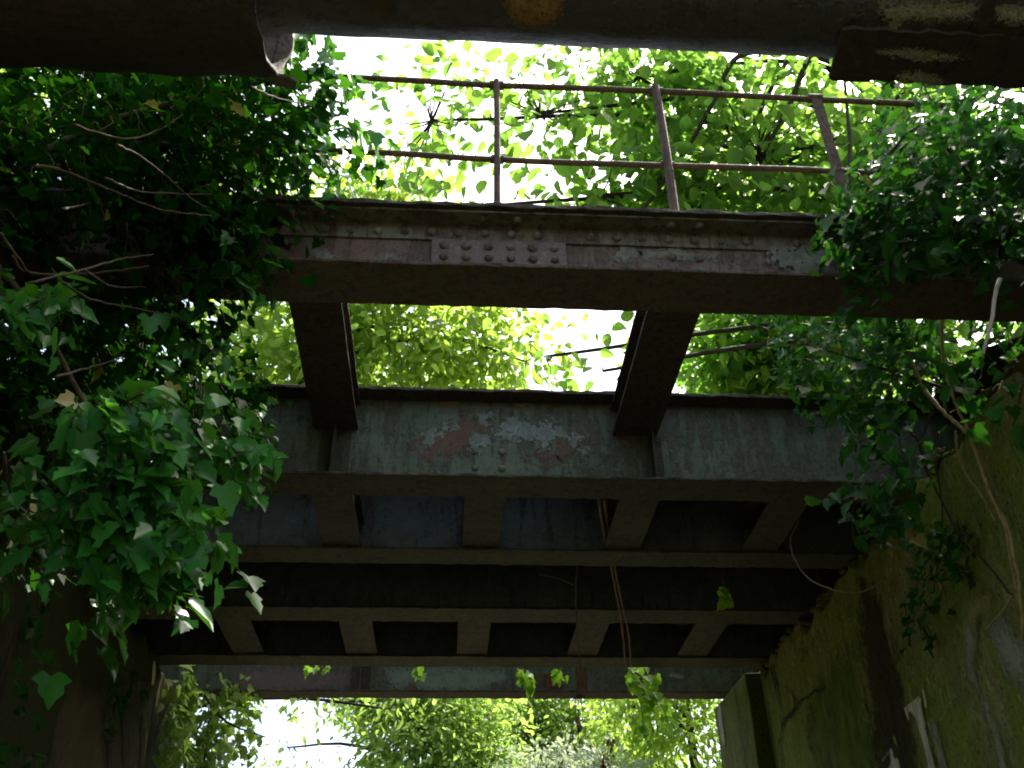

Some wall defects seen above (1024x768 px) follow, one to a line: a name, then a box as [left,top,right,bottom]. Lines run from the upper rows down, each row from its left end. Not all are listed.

peeling [421,411,591,456]
leakage [834,575,947,768]
leakage [962,599,1024,768]